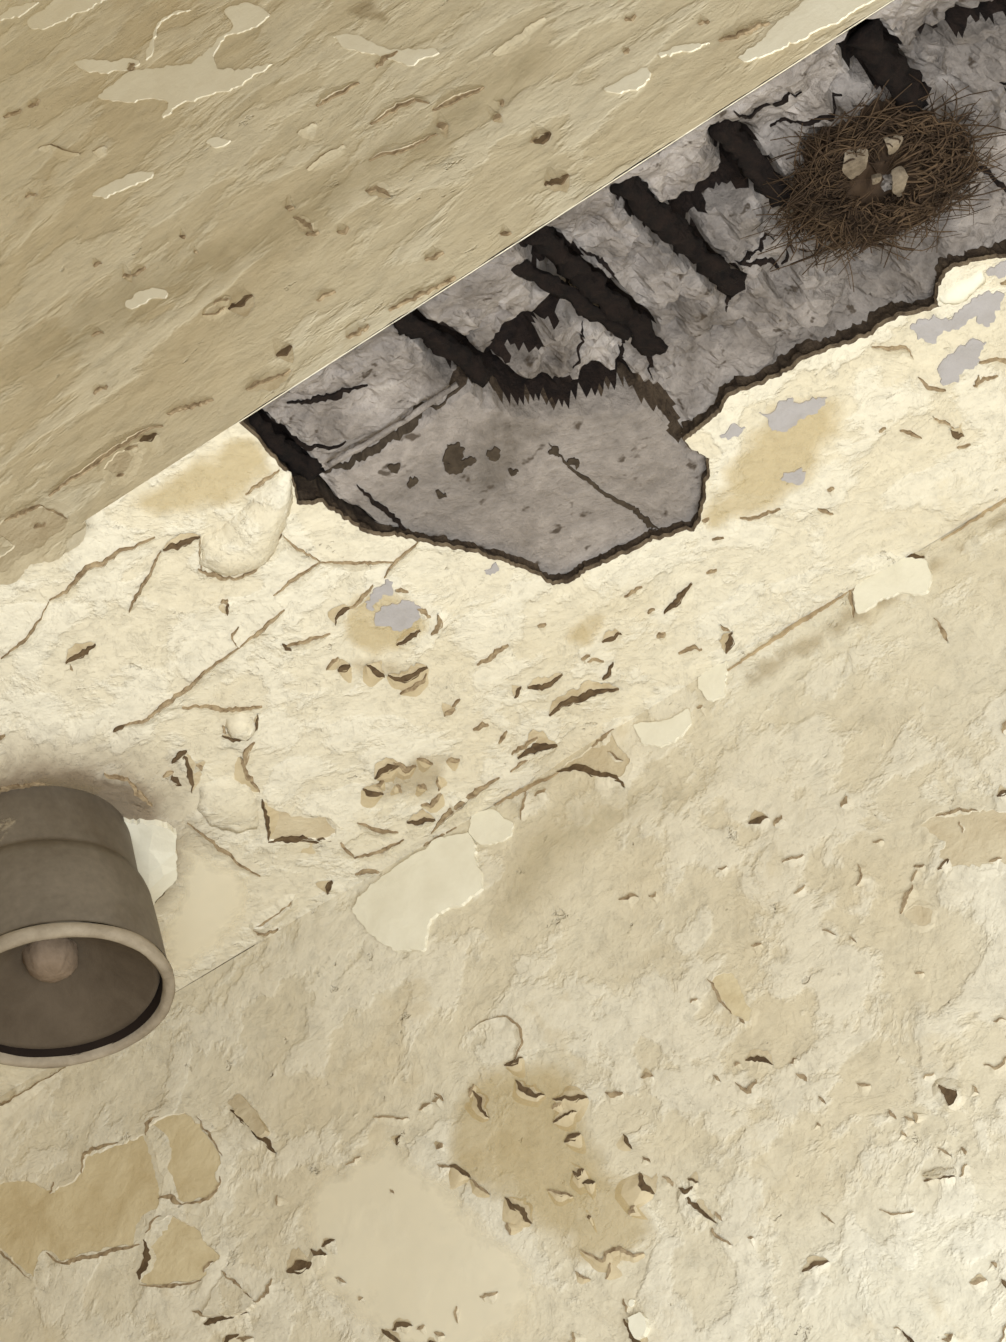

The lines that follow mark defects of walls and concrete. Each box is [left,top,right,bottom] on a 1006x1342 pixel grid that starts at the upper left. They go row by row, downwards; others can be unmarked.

peeling [74,2,272,118]
spalling [235,0,1006,585]
crack [245,470,280,496]
crack [1,536,156,659]
peeling [101,773,188,905]
crack [113,535,420,740]
peeling [182,704,460,859]
peeling [326,579,455,697]
peeling [316,789,551,952]
peeling [473,625,746,797]
peeling [0,1094,346,1342]
peeling [615,1134,732,1249]